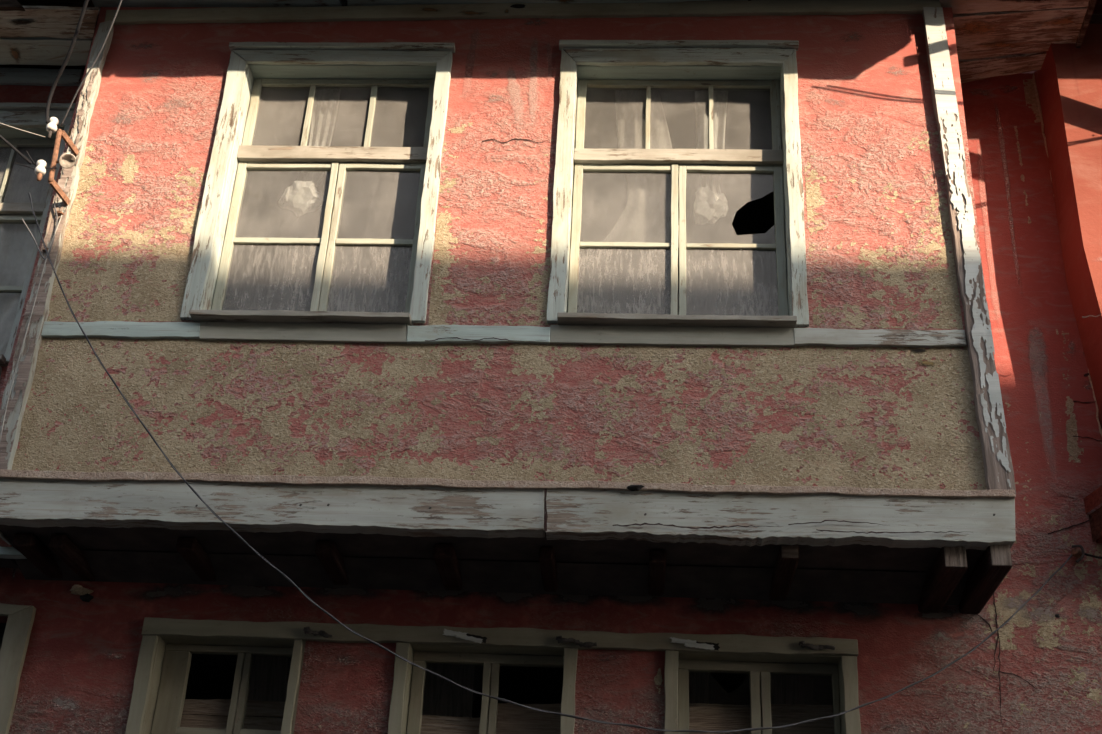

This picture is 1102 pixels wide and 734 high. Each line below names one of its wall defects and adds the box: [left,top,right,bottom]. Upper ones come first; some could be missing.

crack [482,136,545,144]
peeling [0,7,1084,553]
peeling [982,544,1102,650]